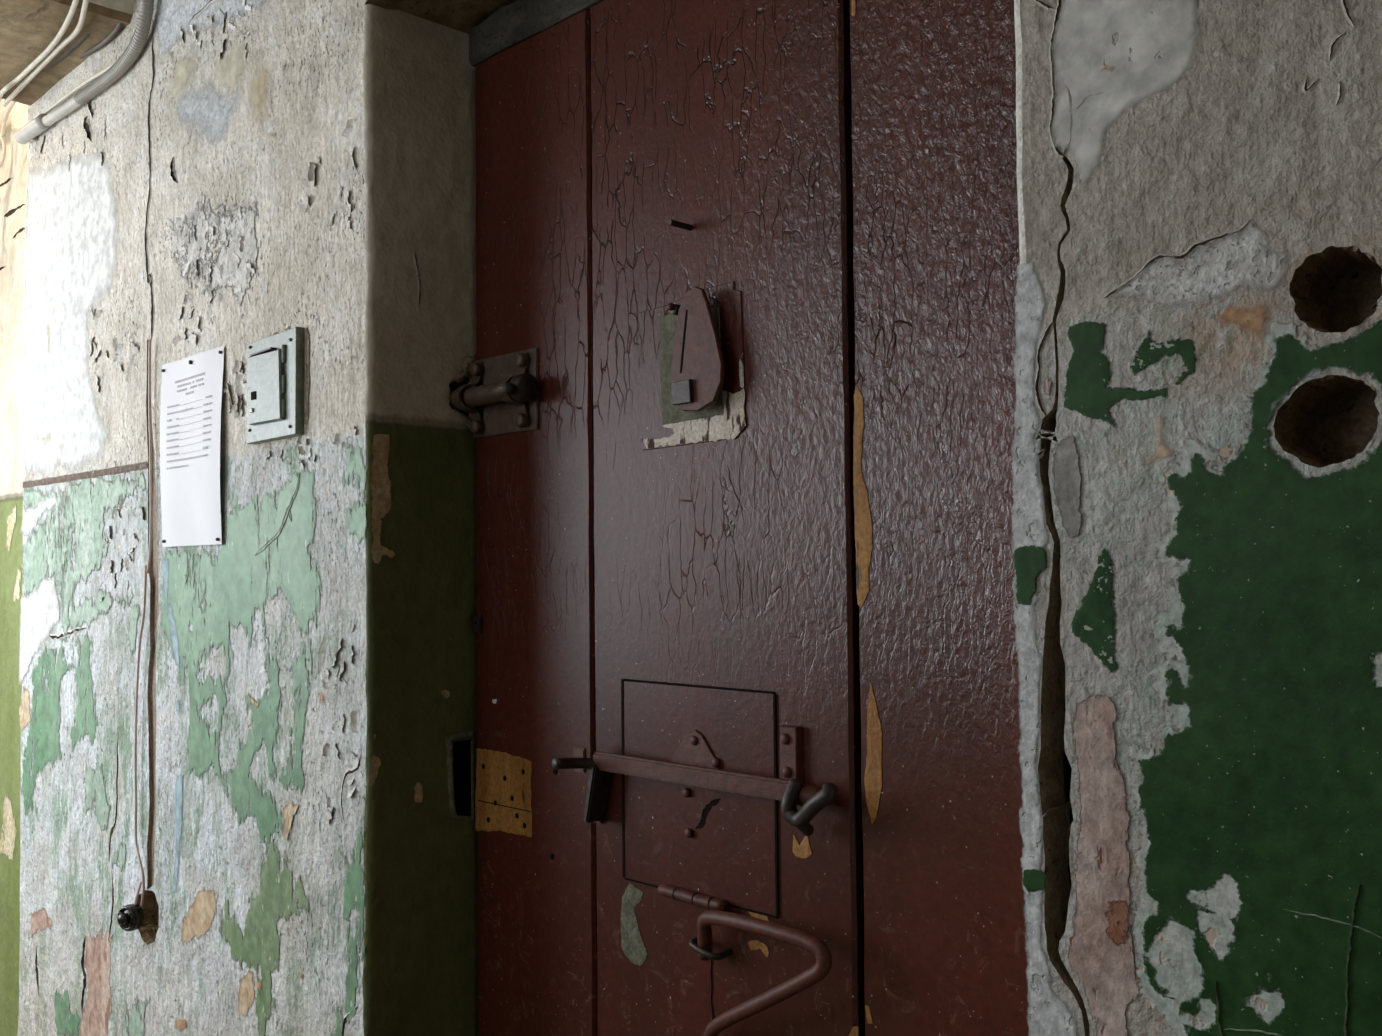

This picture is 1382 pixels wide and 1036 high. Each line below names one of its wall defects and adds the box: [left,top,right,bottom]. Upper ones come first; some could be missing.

crack [1302,0,1355,106]
crack [1104,220,1251,298]
peeling [1043,321,1198,428]
peeling [333,425,395,564]
peeling [1013,545,1046,606]
crack [1034,0,1103,1036]
peeling [0,471,149,860]
peeling [158,327,354,1036]
peeling [1067,319,1382,1036]
peeling [475,748,532,837]
spalling [137,890,159,945]
peeling [329,827,365,1036]